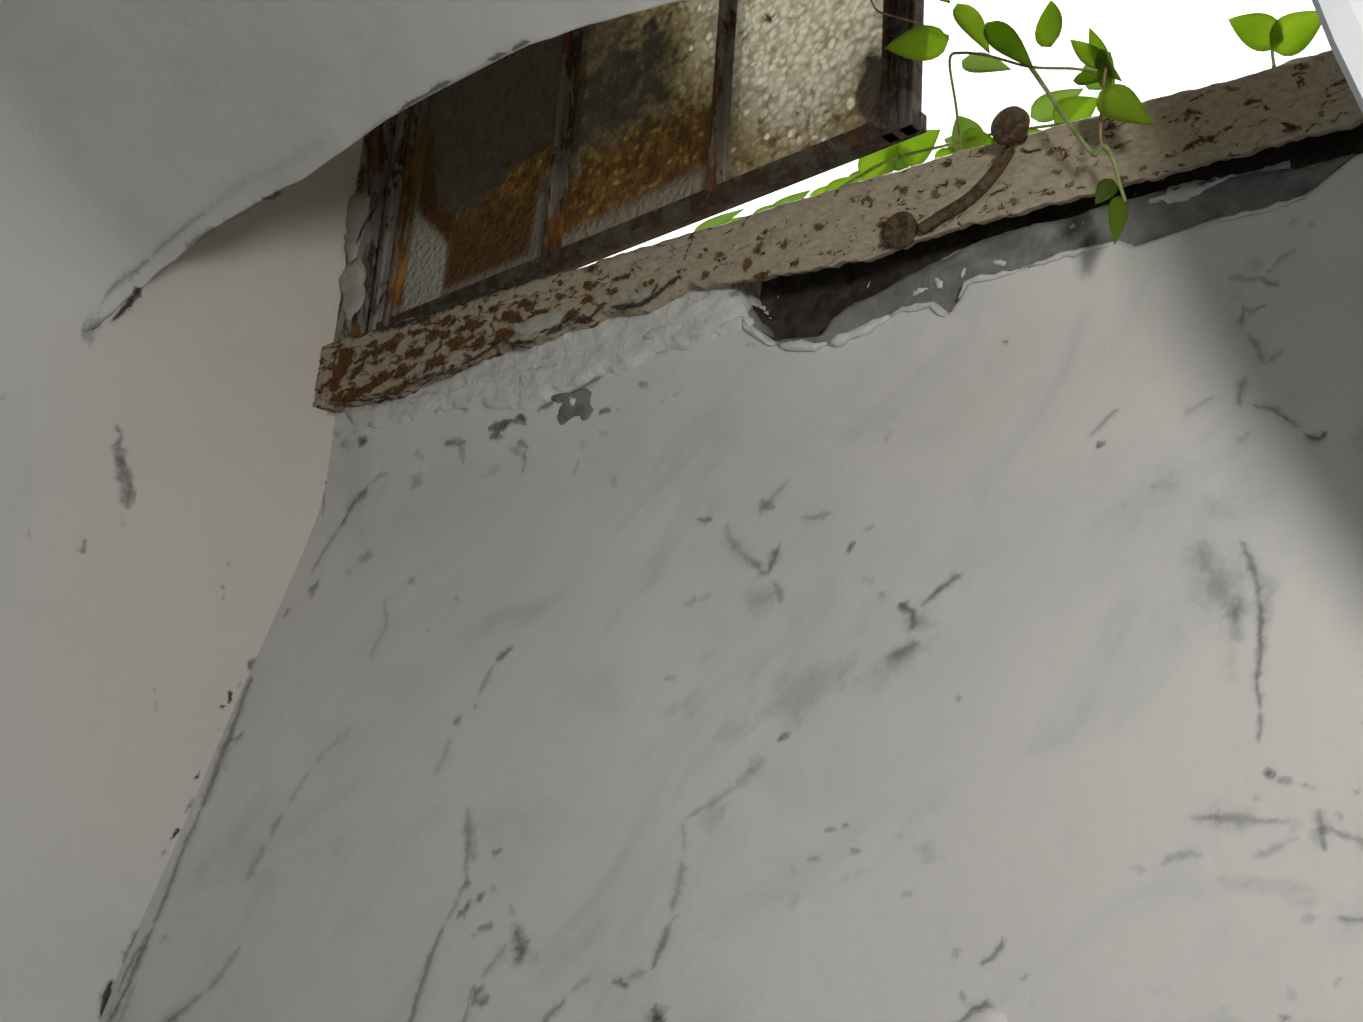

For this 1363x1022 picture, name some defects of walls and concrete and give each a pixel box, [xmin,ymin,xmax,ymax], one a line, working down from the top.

peeling [339,164,380,321]
rust [733,242,770,290]
spalling [741,123,1363,352]
rust [329,273,655,408]
spalling [551,388,610,425]